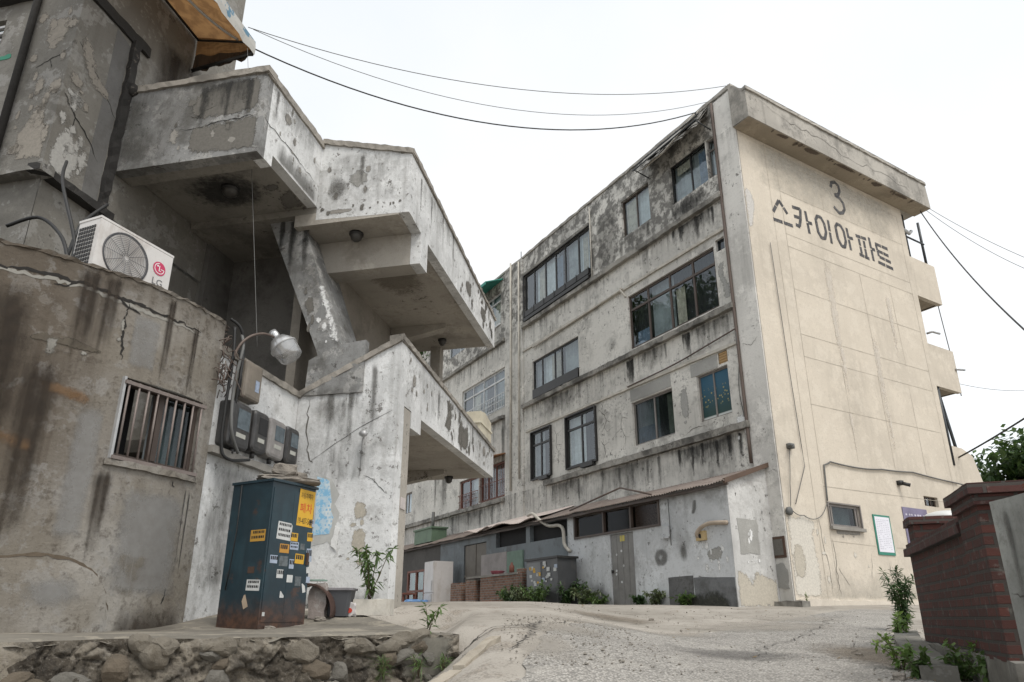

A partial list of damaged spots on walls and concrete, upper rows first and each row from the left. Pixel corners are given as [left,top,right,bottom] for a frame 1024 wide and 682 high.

peeling [39,5,79,60]
peeling [7,37,109,180]
crack [66,95,97,161]
leakage [197,177,260,204]
crack [0,264,201,358]
leakage [81,275,121,313]
peeling [304,286,339,343]
leakage [57,412,109,532]
crack [306,402,392,463]
peeling [445,400,492,465]
leakage [678,433,742,470]
peeling [346,502,367,565]